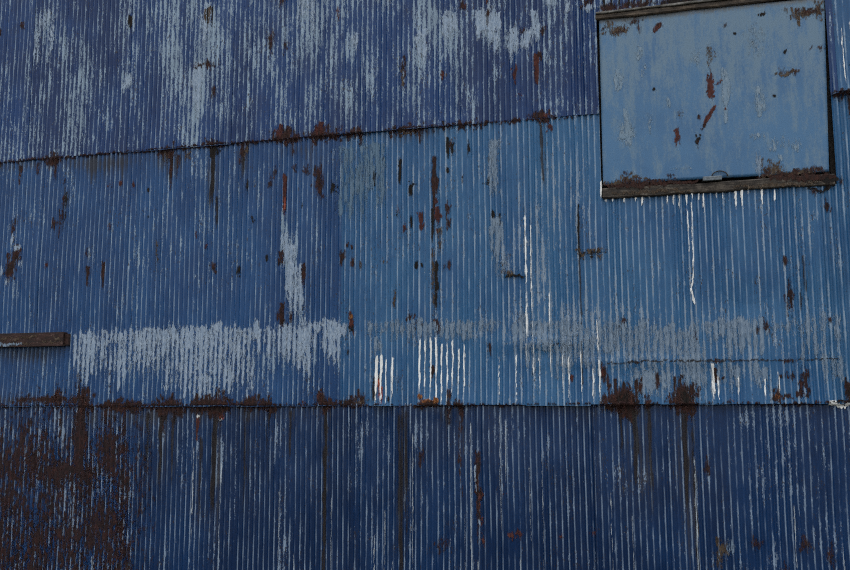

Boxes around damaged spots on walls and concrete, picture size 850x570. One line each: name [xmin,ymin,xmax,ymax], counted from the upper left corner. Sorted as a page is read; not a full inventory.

rust [784,0,824,26]
rust [695,43,726,144]
rust [0,109,577,334]
rust [603,171,699,197]
rust [733,152,842,212]
peeling [0,335,62,347]
peeling [73,232,347,399]
rust [0,359,850,570]